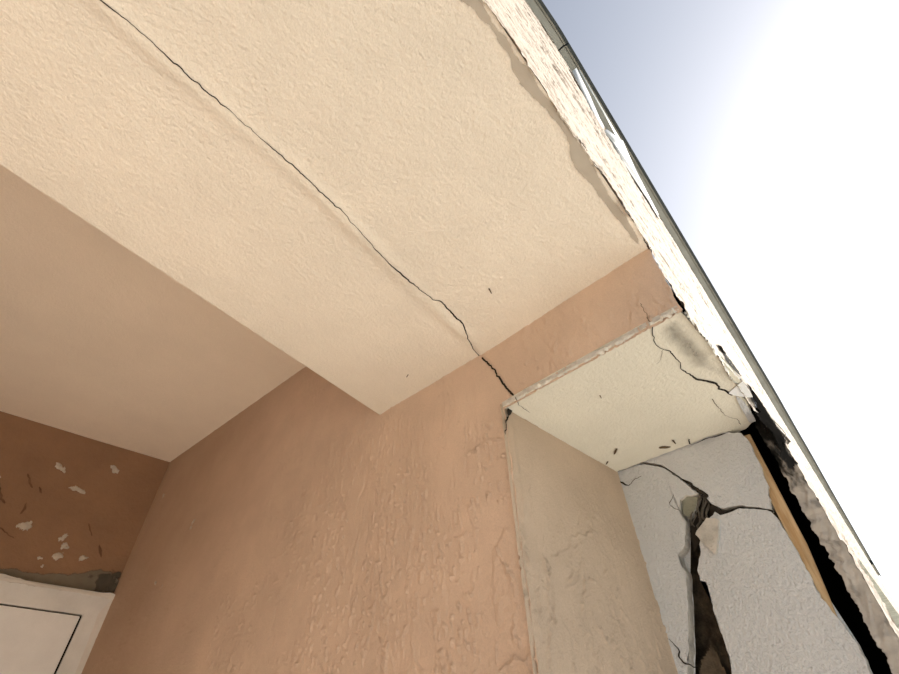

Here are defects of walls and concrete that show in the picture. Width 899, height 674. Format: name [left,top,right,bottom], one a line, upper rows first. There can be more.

crack [100,0,526,435]
flaking render [0,534,119,594]
crack [620,303,899,674]
mould [748,385,798,470]